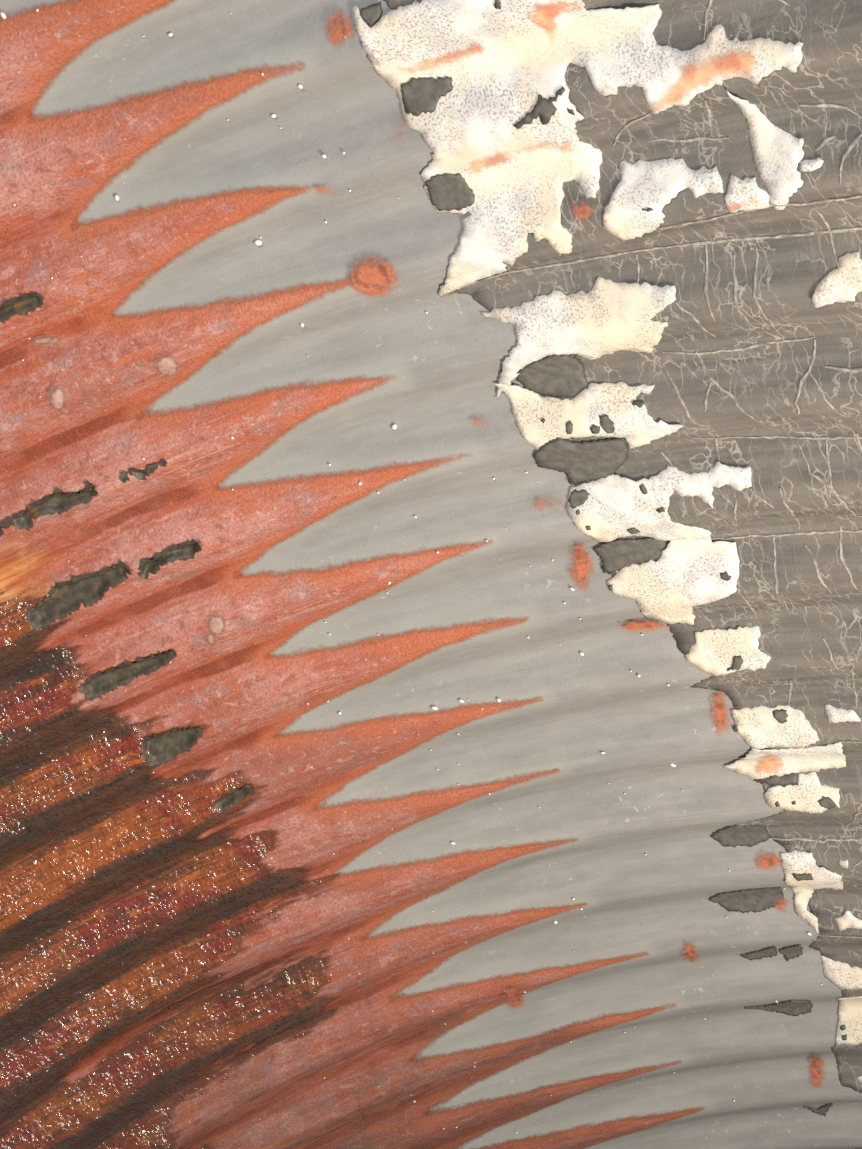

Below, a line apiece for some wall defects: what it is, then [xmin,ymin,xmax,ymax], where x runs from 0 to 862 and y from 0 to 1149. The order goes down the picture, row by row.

crack [704,0,712,40]
peeling [352,0,824,296]
crack [613,100,730,146]
crack [799,104,862,185]
crack [813,208,839,268]
peeling [480,277,771,676]
corrosion [0,0,678,1149]
corrosion [711,692,729,735]
corrosion [757,755,780,773]
peeling [722,705,846,814]
peeling [709,850,848,934]
corrosion [809,1056,824,1087]